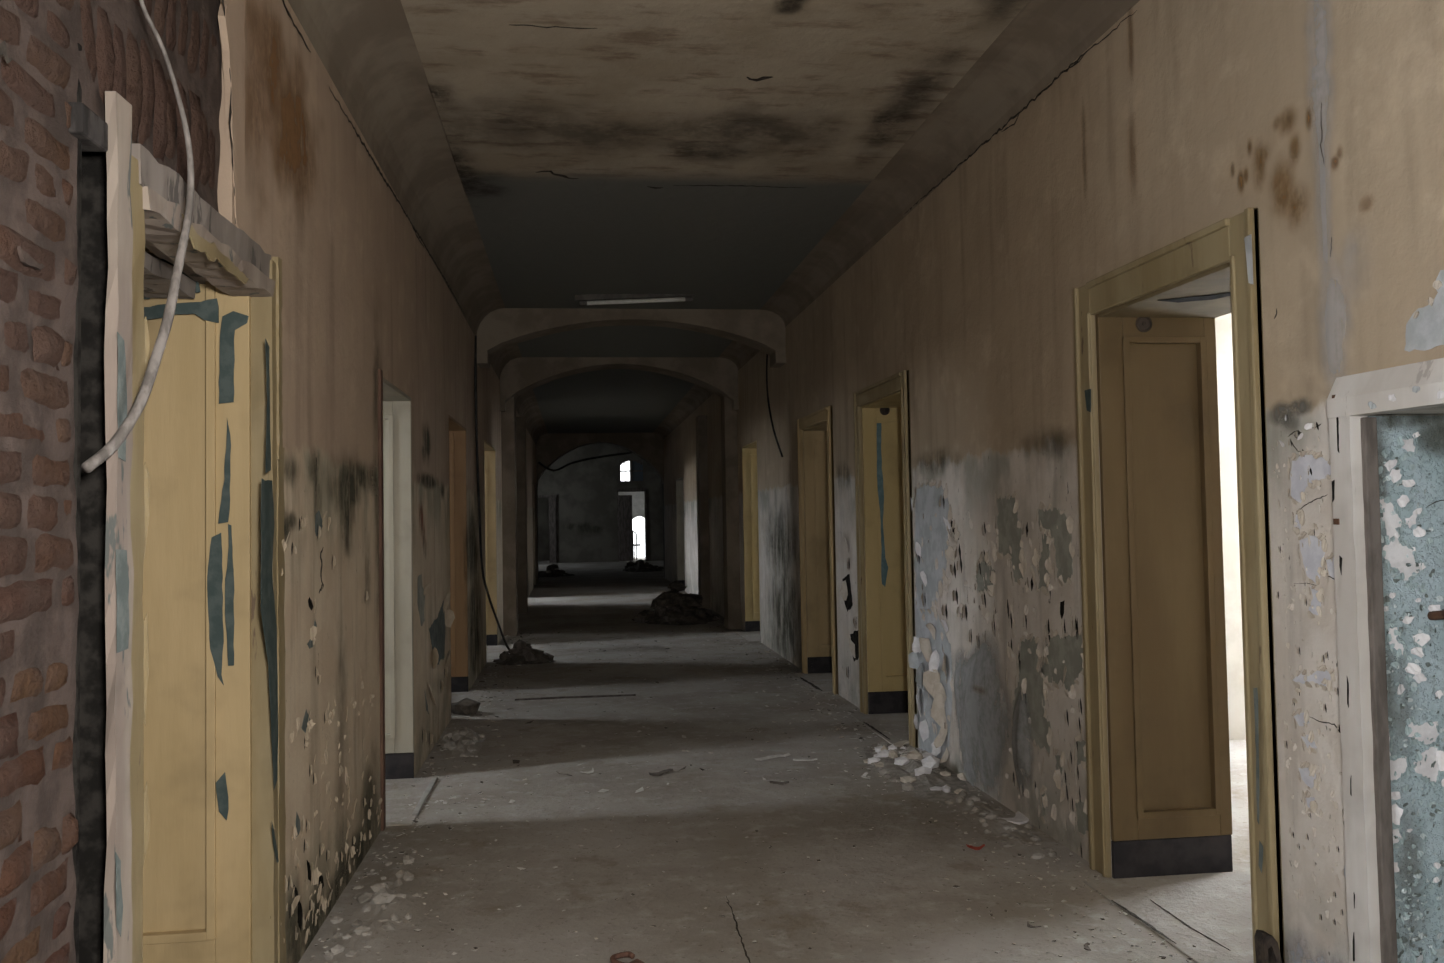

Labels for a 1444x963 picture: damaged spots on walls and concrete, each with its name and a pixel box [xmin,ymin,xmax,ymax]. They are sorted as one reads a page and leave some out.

flaking render [1404,270,1444,352]
peeling [908,479,1089,856]
peeling [1285,647,1338,817]
peeling [1378,432,1444,963]